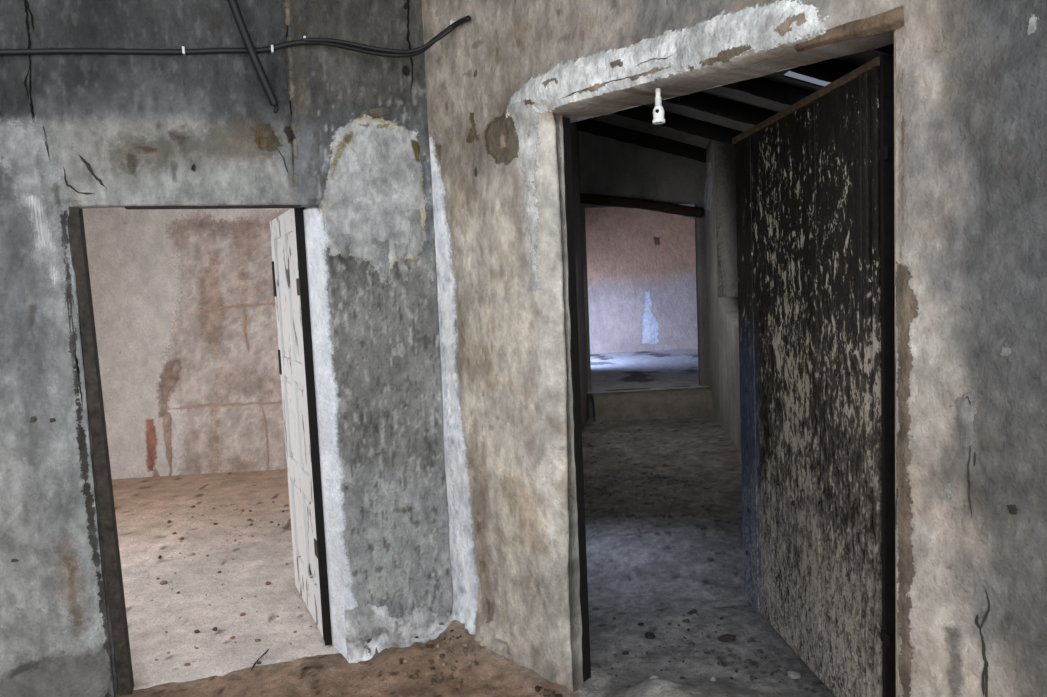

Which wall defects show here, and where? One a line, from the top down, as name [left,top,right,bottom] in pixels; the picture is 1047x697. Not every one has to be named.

peeling [774,12,807,36]
crack [24,0,107,195]
peeling [630,66,670,81]
peeling [688,45,752,71]
spalling [466,112,520,165]
crack [947,587,990,697]